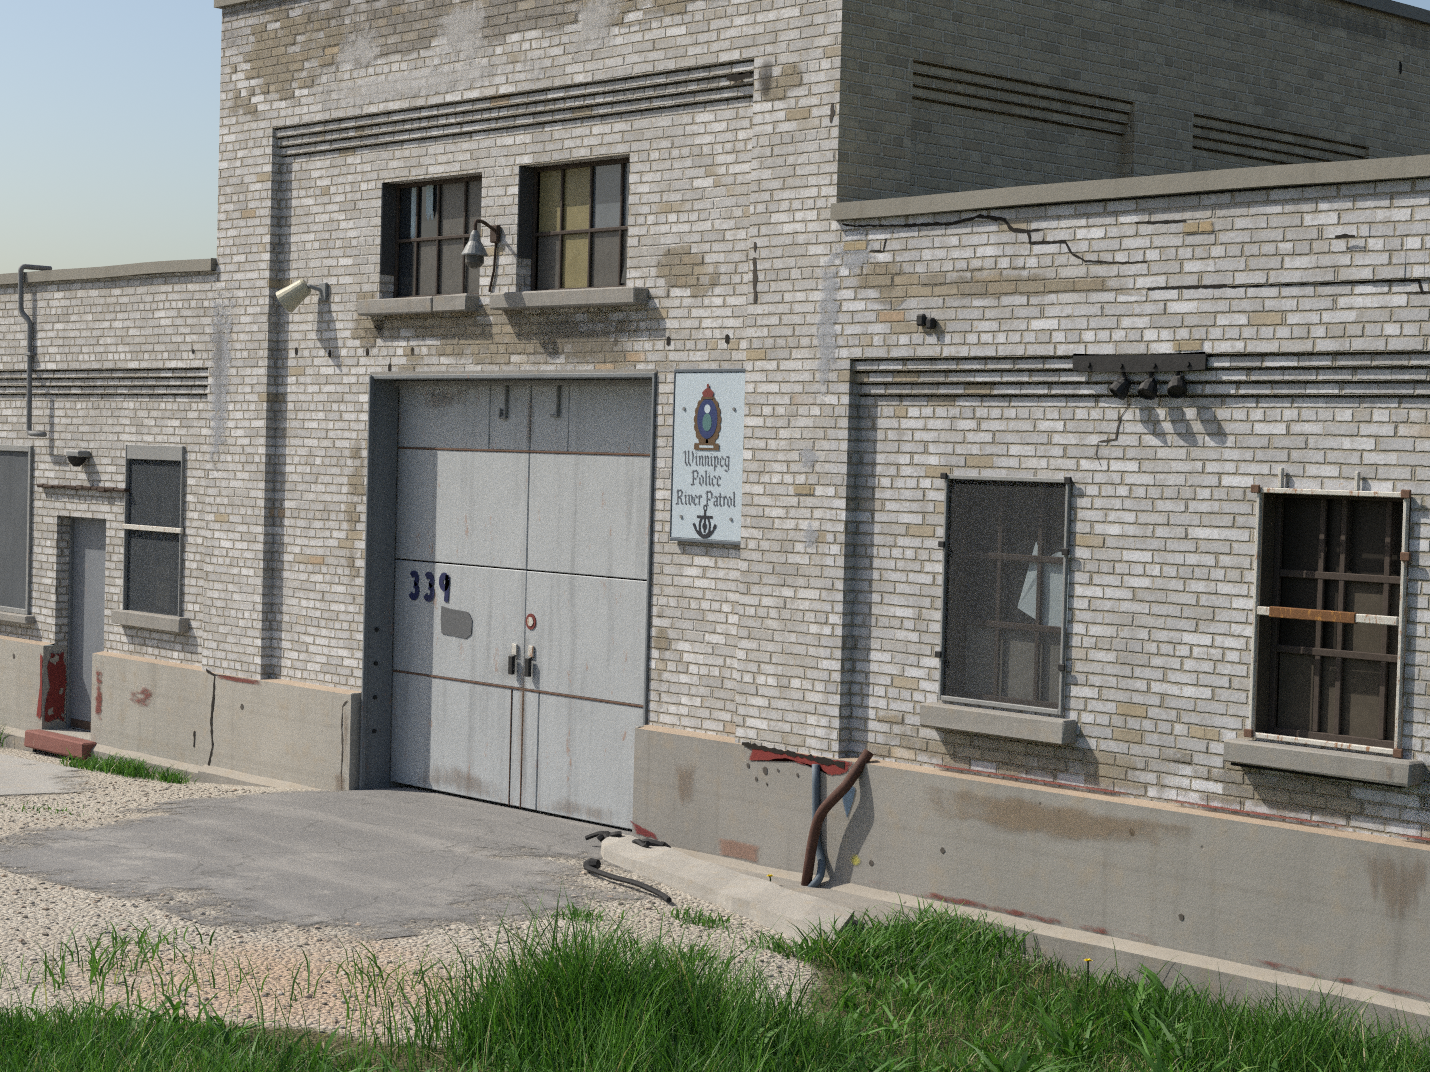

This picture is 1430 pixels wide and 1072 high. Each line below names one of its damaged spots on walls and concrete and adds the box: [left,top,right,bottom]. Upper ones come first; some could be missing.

crack [842,214,1430,294]
spalling [36,653,64,720]
crack [193,668,231,766]
spalling [742,742,852,785]
leakage [989,800,1141,836]